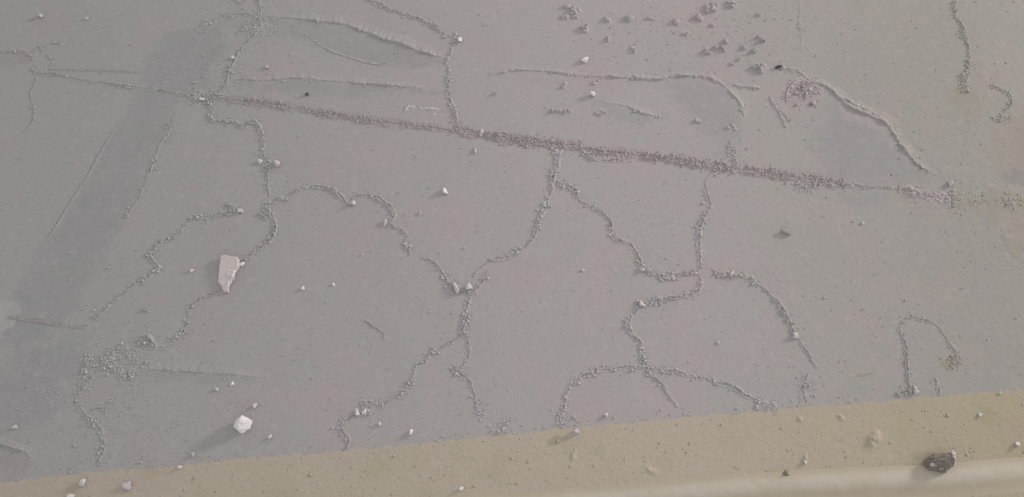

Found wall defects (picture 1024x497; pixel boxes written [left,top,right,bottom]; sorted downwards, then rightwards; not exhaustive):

crack [950,0,1014,125]
crack [43,0,963,428]
crack [70,292,213,465]